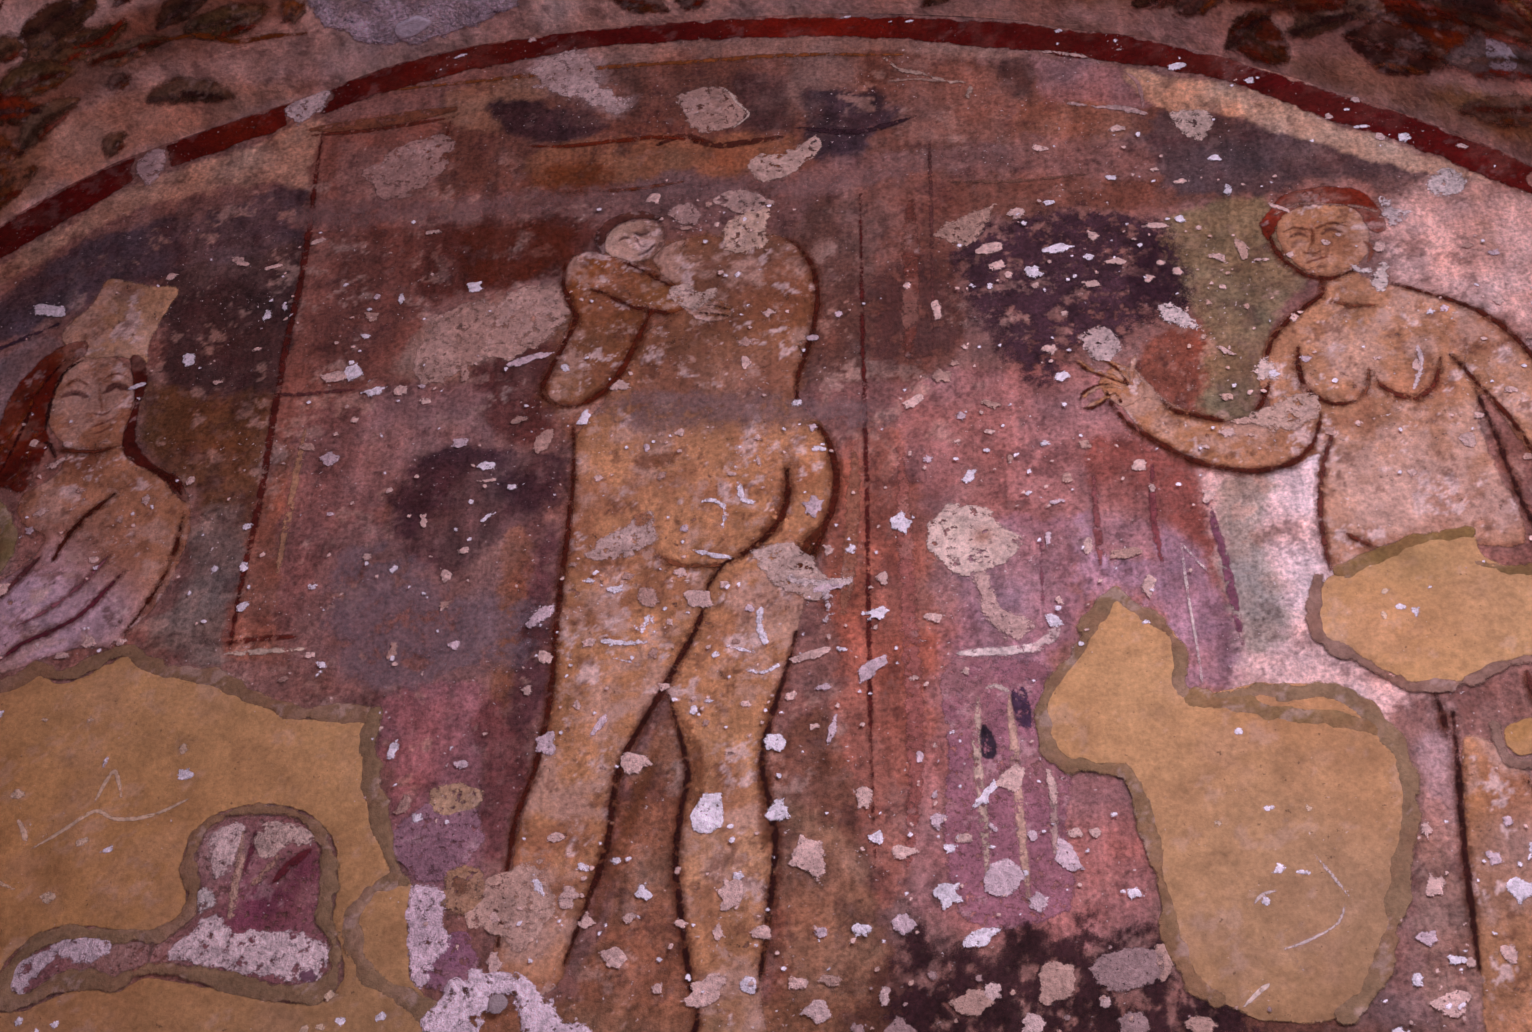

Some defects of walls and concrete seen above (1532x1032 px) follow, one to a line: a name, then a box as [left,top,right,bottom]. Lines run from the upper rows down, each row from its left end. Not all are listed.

peeling [676,86,750,133]
peeling [646,135,822,310]
peeling [737,304,789,369]
peeling [609,372,633,390]
peeling [610,428,684,452]
peeling [782,424,833,452]
peeling [877,503,1064,641]
peeling [749,908,842,1024]
peeling [850,966,938,1032]
peeling [948,975,1016,1023]
peeling [1022,943,1174,1032]
peeling [1183,1015,1218,1032]